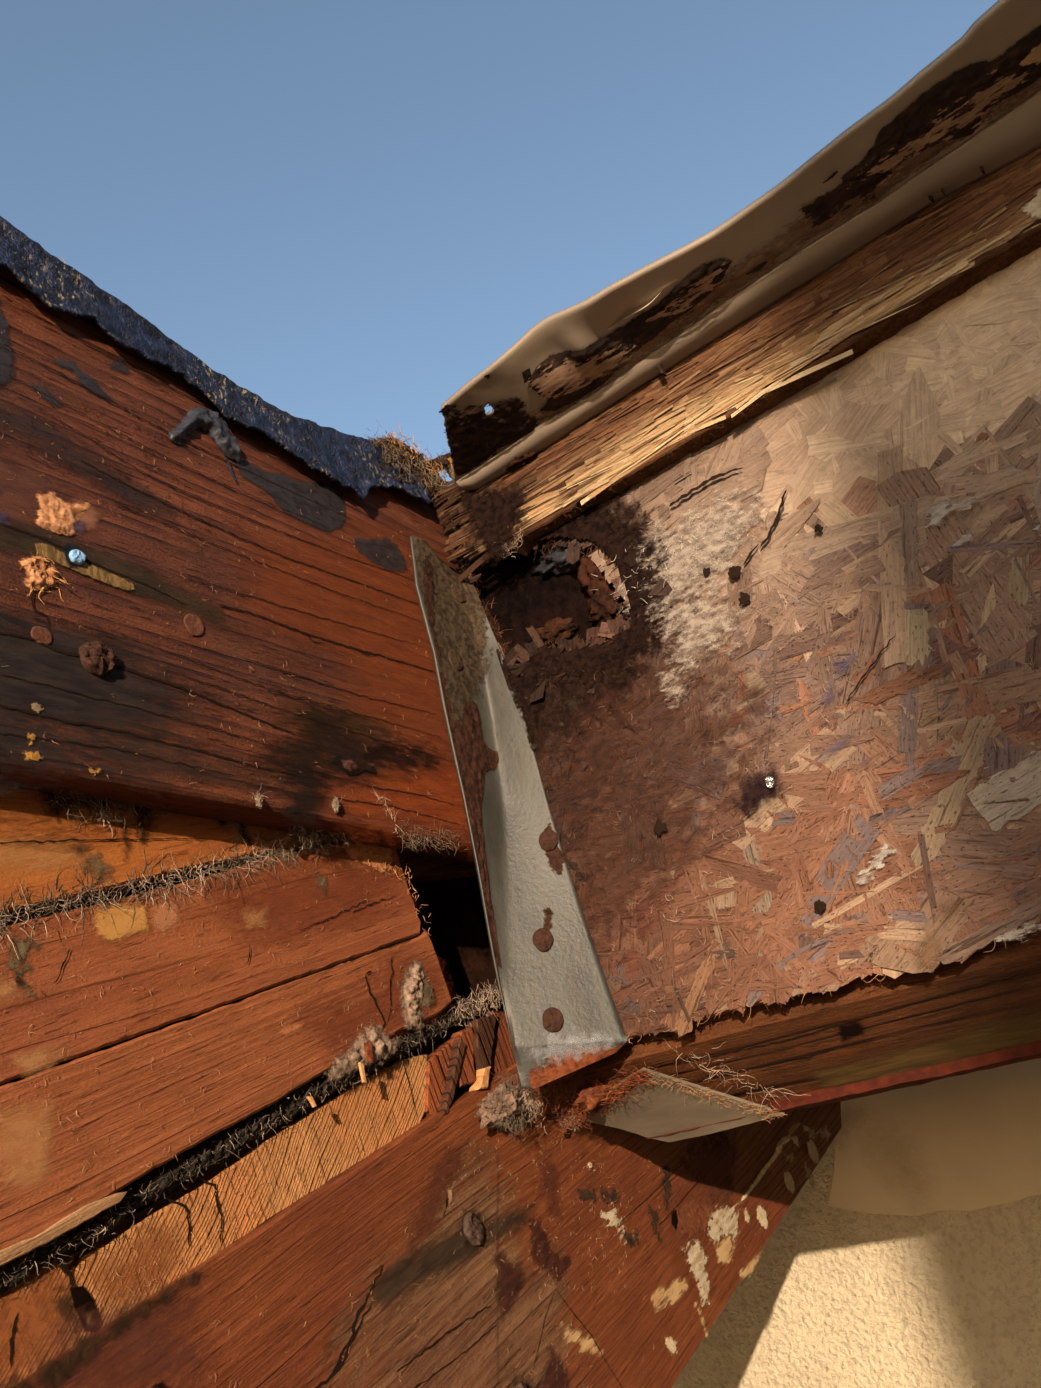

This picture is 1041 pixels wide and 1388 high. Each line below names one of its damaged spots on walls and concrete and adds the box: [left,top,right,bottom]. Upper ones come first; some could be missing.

peeling [36,492,98,536]
crack [744,489,787,564]
peeling [19,551,72,604]
leakage [531,489,765,946]
leakage [339,769,467,828]
corrosion [545,846,565,875]
corrosion [543,908,554,930]
peeling [682,1205,739,1307]
crack [315,1265,383,1388]
crack [397,1305,496,1388]